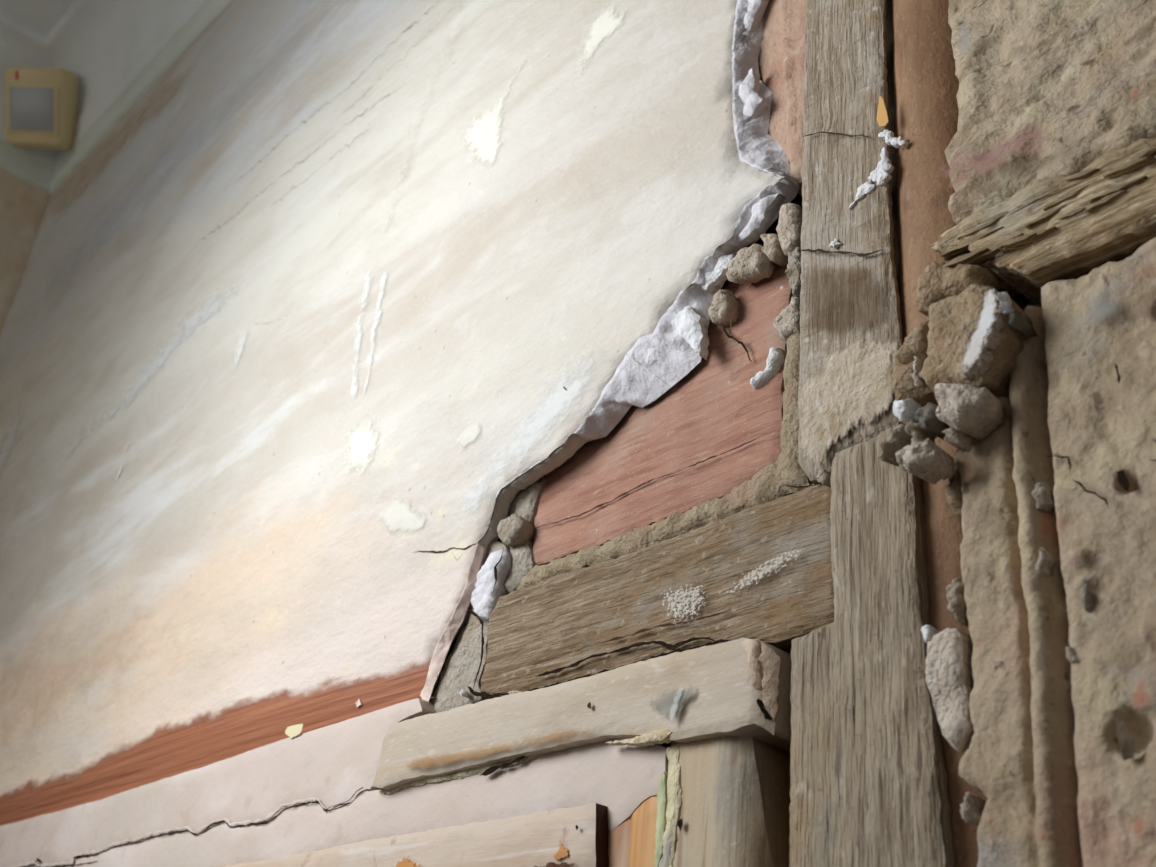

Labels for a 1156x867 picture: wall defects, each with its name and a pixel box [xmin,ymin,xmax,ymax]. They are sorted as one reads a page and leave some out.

crack [200,1,447,240]
flaking render [0,0,799,826]
crack [417,544,473,560]
crack [493,547,504,591]
crack [466,607,769,699]
crack [8,787,364,867]
peeling [396,856,420,867]